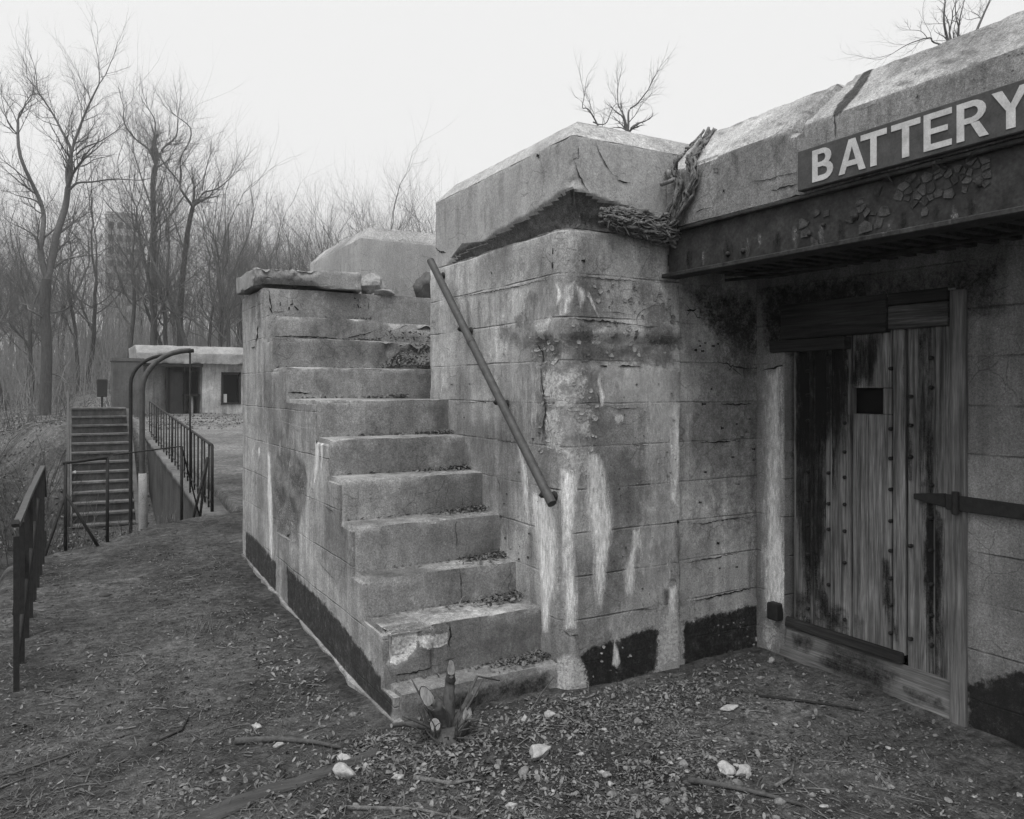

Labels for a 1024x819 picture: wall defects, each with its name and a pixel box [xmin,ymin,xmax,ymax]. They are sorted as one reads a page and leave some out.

crack [833,69,872,135]
spalling [451,189,619,264]
crack [536,343,552,439]
leakage [245,443,392,717]
spalling [382,625,448,665]
leakage [519,448,611,630]
leakage [581,334,878,687]
leakage [882,560,897,639]
leakage [908,331,943,675]
leakage [967,670,1024,748]